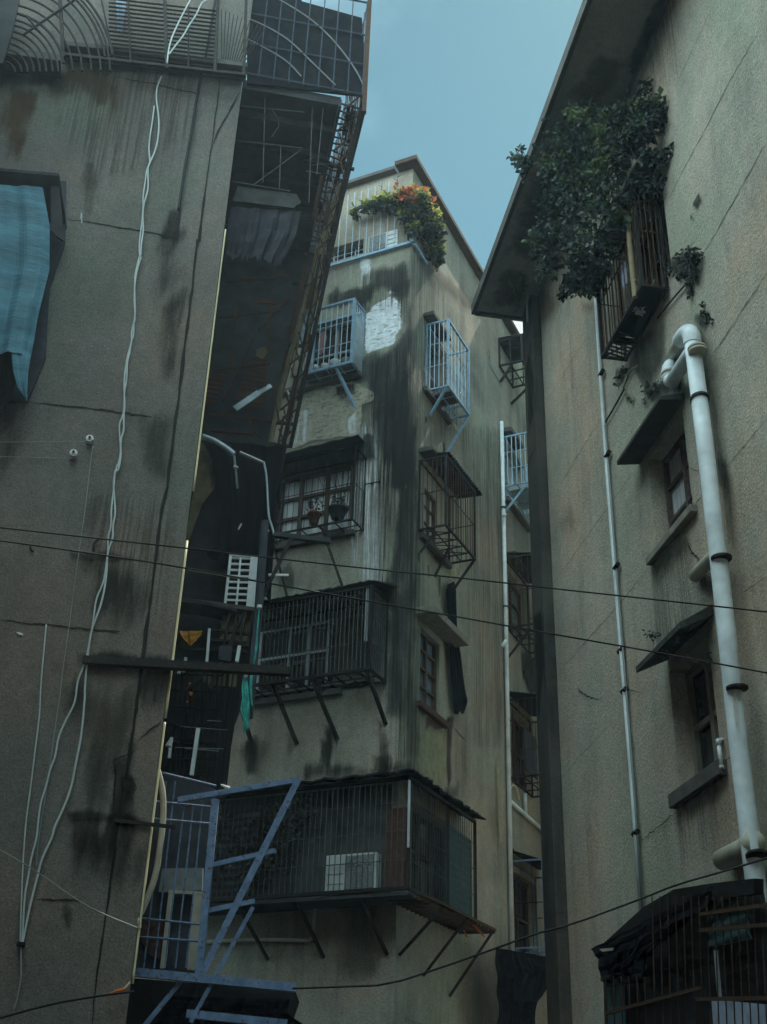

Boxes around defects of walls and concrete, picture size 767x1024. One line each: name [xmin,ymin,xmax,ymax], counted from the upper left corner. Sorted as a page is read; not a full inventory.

leakage [68,742,139,880]
crack [2,76,240,1024]
leakage [304,727,354,779]
leakage [328,259,469,772]